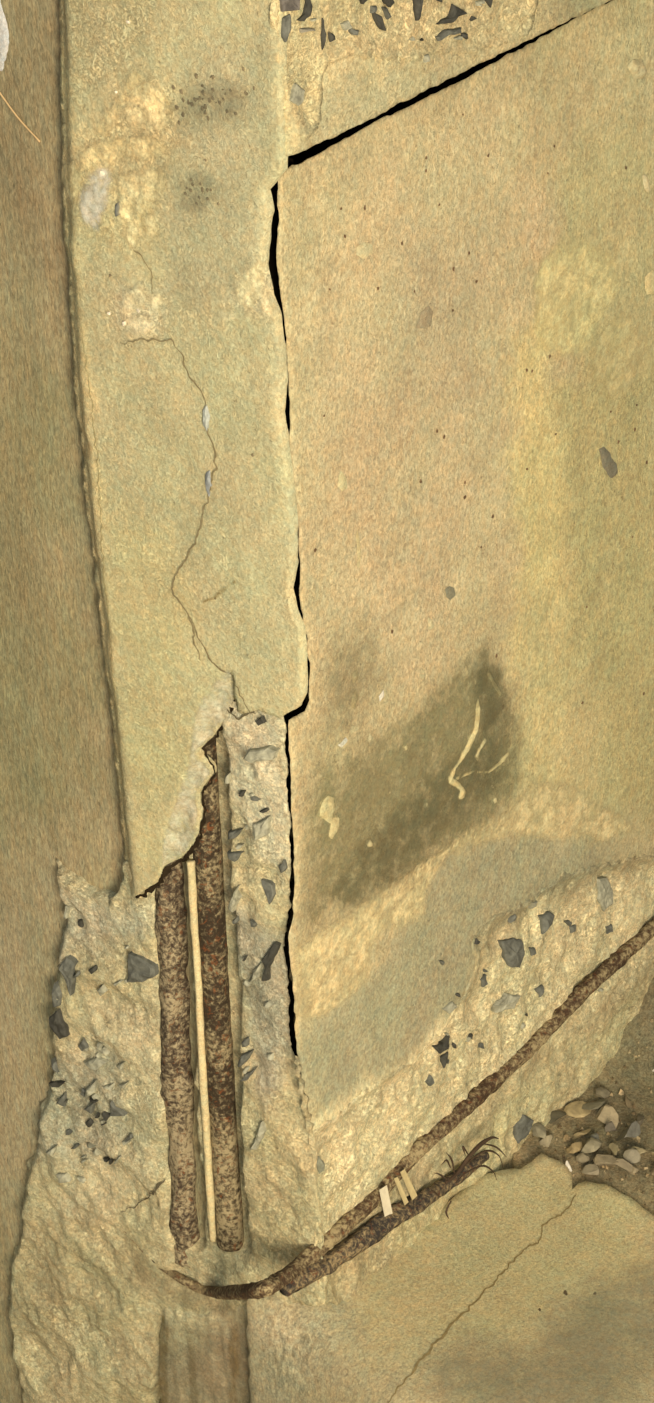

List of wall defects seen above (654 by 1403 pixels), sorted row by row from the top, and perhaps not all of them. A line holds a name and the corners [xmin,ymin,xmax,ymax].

crack [129,244,153,294]
crack [268,0,611,444]
crack [81,323,310,1074]
damp [310,660,516,922]
spalling [8,695,654,1403]
crack [388,1195,576,1403]